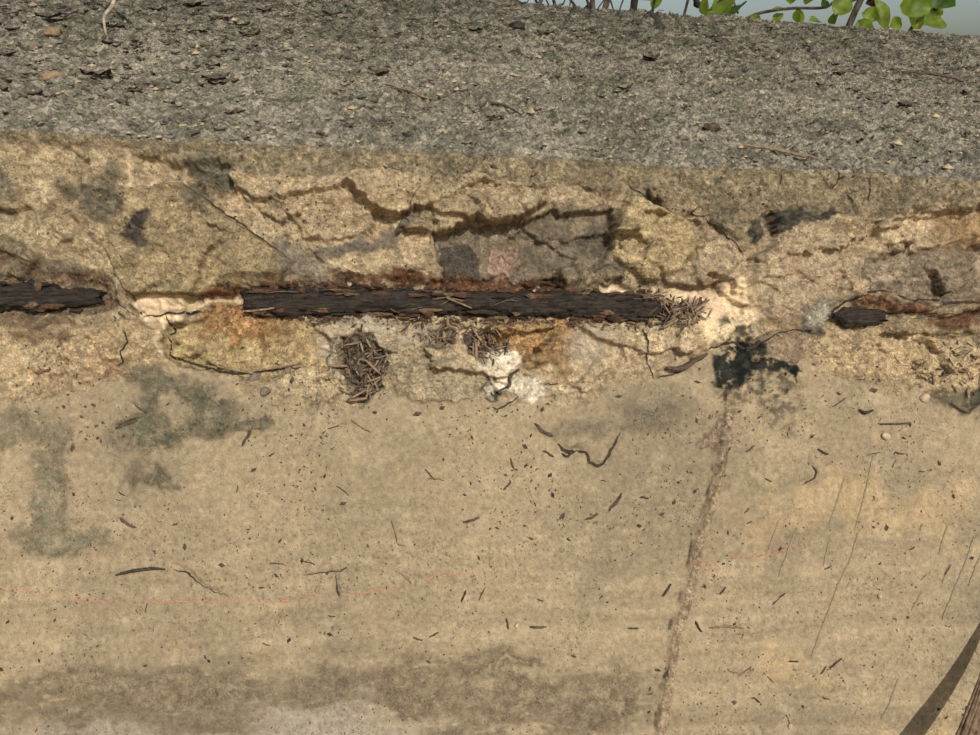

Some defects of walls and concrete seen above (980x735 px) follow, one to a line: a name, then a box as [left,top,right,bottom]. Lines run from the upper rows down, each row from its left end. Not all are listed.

rust [0,268,119,345]
spalling [0,140,782,408]
rust [198,267,654,372]
mould [713,317,801,397]
spalling [745,206,980,398]
rust [853,293,980,329]